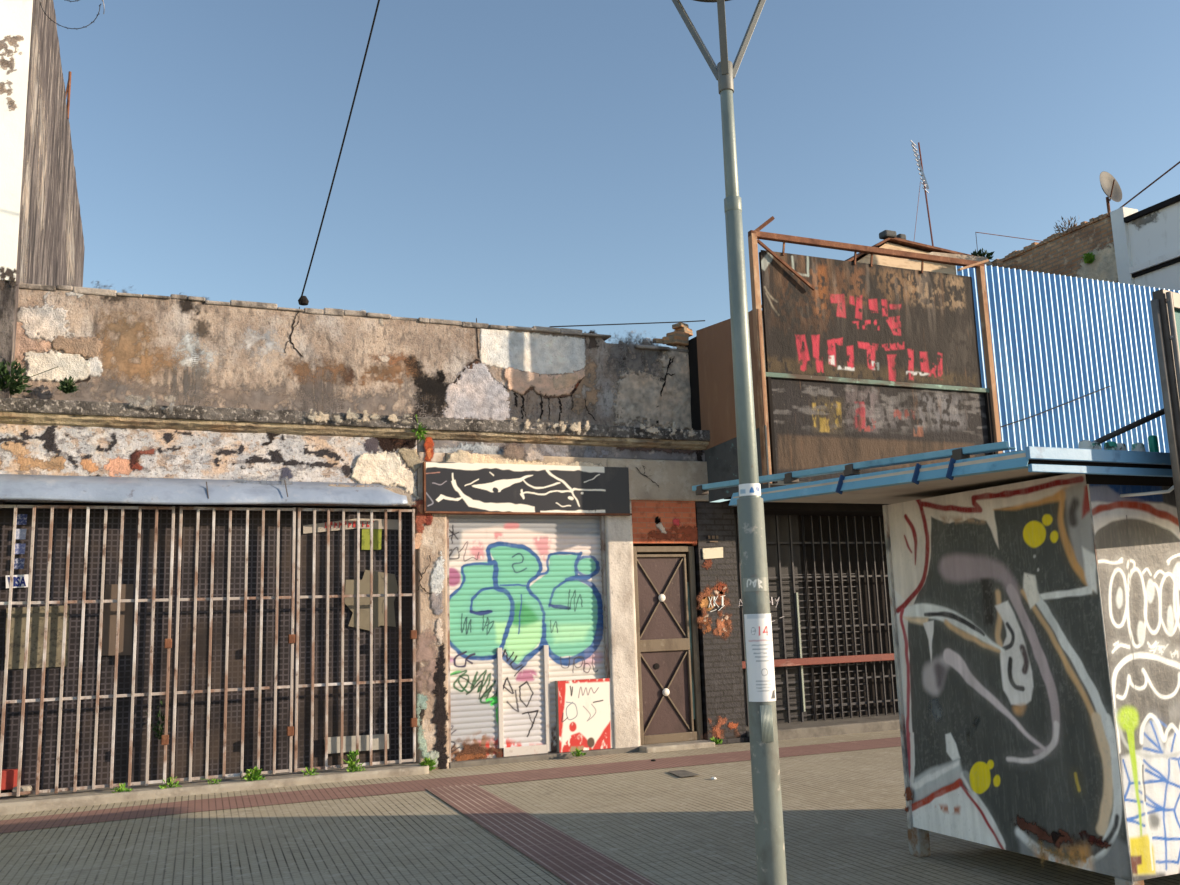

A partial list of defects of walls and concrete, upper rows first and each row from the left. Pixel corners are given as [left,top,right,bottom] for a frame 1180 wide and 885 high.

peeling [0,35,24,111]
peeling [0,425,141,477]
peeling [158,430,193,453]
leakage [12,298,447,417]
peeling [215,433,433,549]
flaking render [308,408,412,424]
flaking render [392,361,611,471]
crack [453,318,596,421]